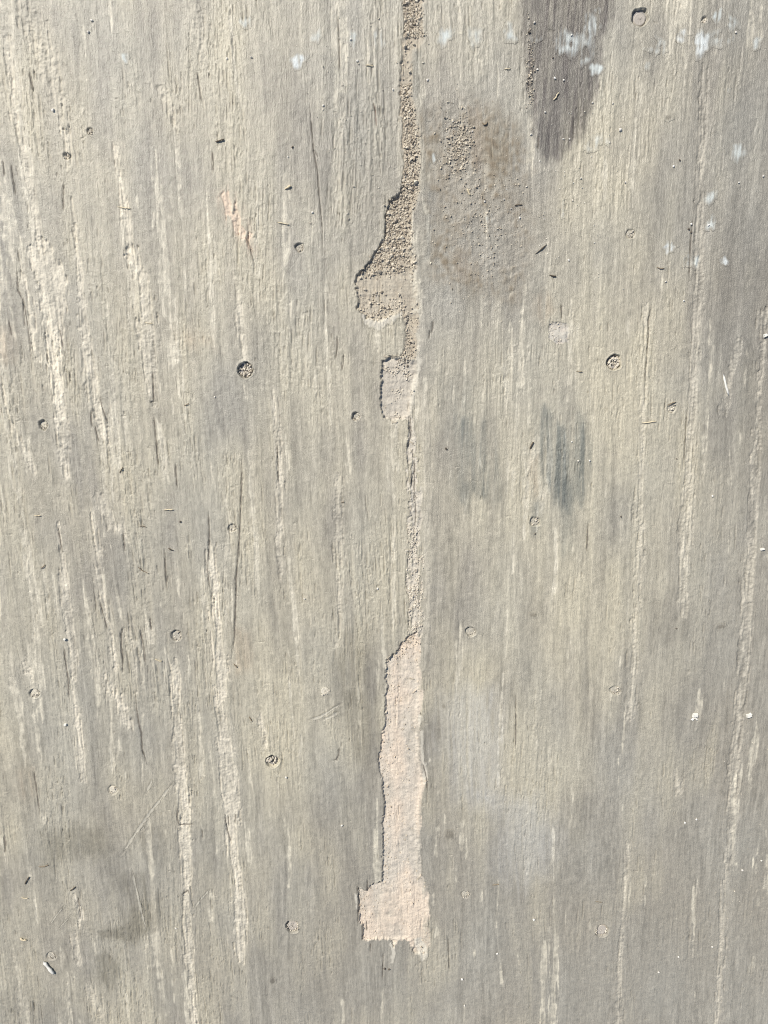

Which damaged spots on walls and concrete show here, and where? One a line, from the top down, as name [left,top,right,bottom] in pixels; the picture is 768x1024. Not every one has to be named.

damp [293,43,403,273]
damp [413,0,617,319]
peeling [354,0,432,965]